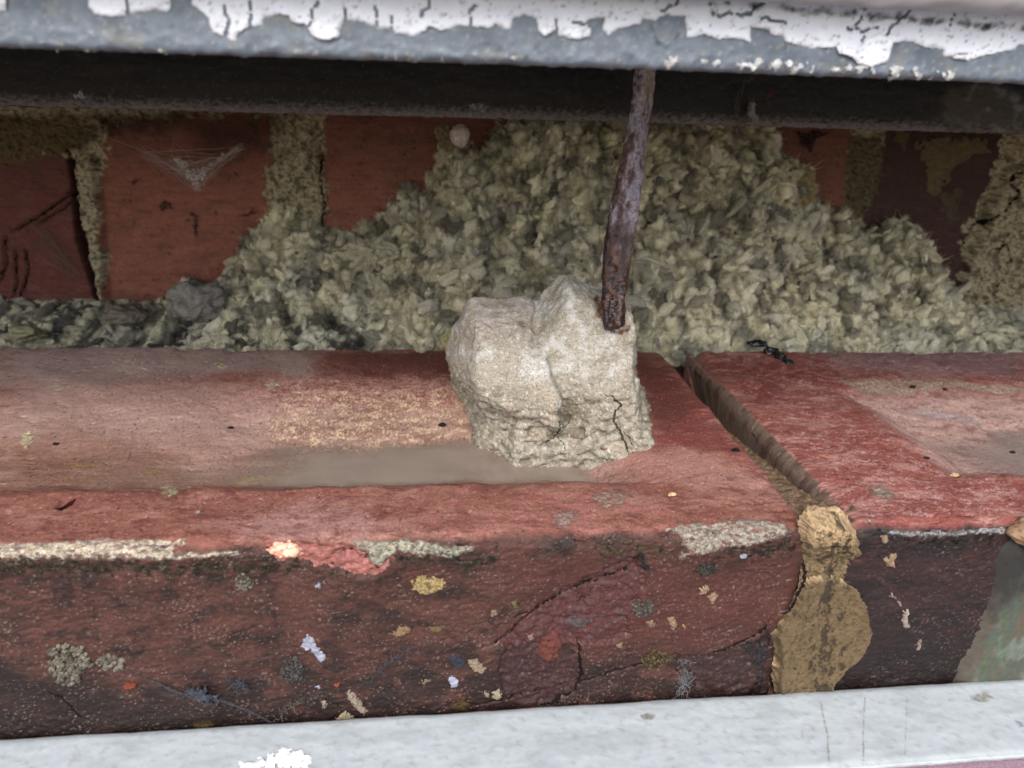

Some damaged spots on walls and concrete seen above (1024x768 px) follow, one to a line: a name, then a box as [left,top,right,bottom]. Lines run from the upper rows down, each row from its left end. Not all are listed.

peeling [88,0,170,17]
peeling [192,0,1024,67]
crack [539,415,571,450]
crack [605,395,634,454]
spalling [265,540,396,575]
crack [487,555,639,646]
crack [492,643,677,706]